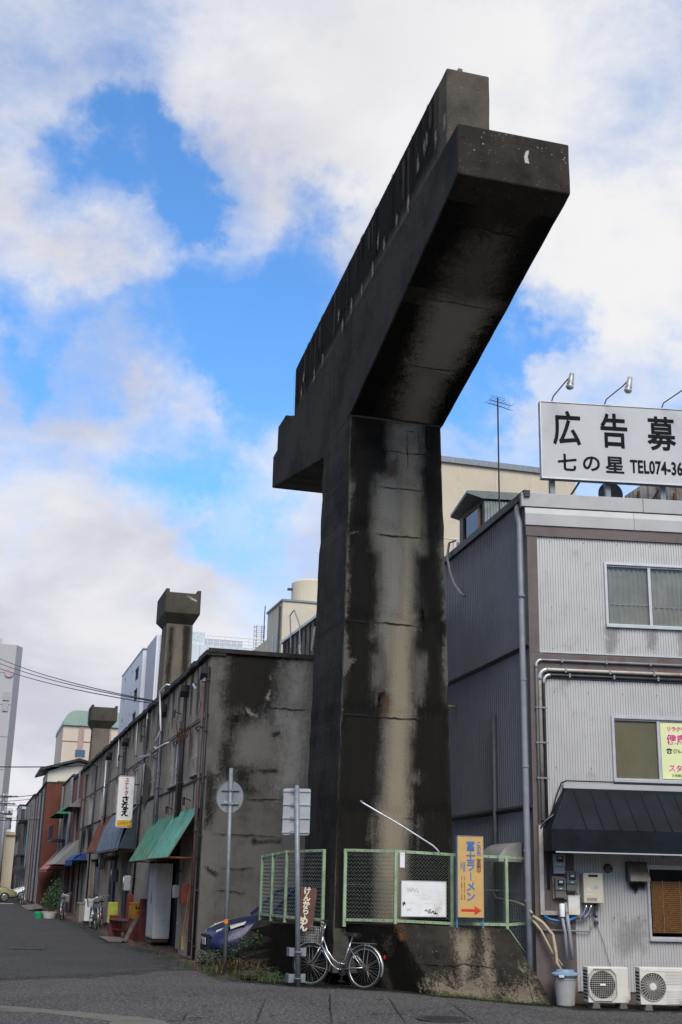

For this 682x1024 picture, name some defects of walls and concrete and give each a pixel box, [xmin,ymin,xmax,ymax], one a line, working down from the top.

water stain [84,621,316,828]
water stain [266,200,556,1000]